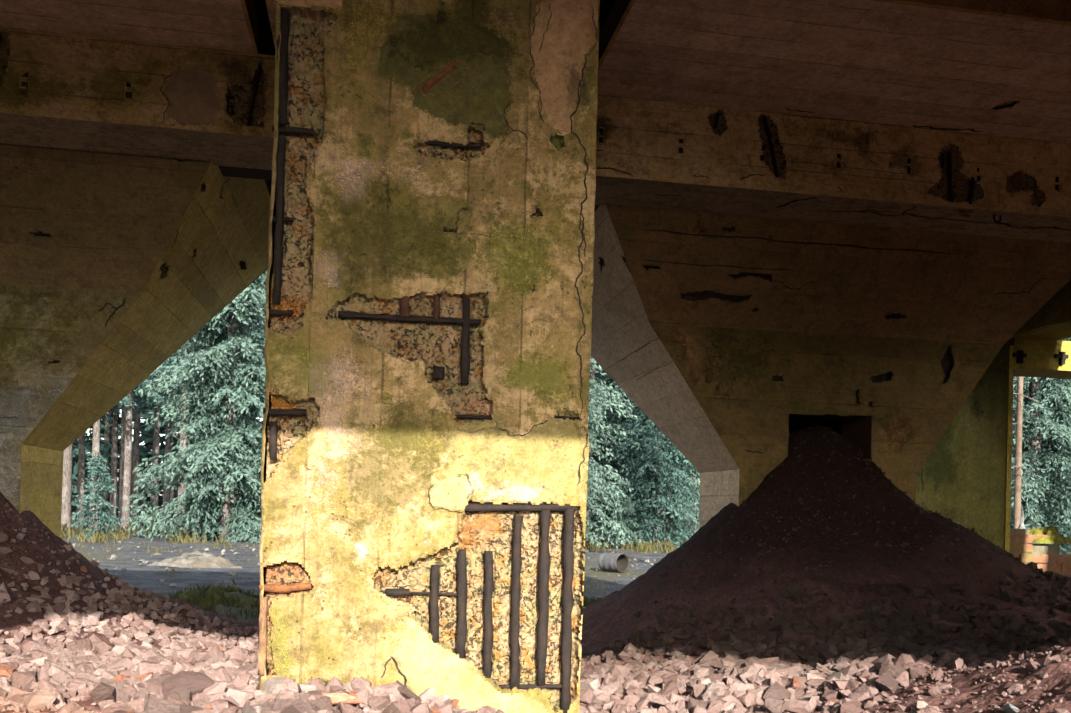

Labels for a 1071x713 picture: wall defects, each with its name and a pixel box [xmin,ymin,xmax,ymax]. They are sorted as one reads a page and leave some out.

spalling [224,5,340,335]
flaking render [375,12,514,162]
crack [499,0,634,486]
spalling [758,114,787,180]
spalling [925,142,984,204]
spalling [1005,170,1047,207]
spalling [263,391,323,483]
spalling [324,193,586,713]